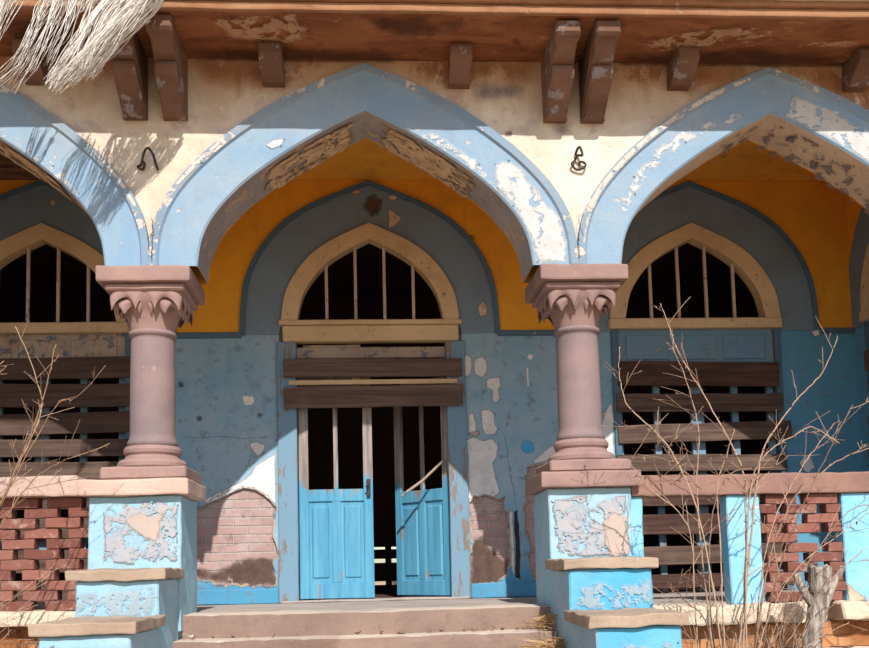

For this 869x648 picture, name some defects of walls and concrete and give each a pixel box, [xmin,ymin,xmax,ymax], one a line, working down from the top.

peeling [0,135,79,206]
peeling [266,122,353,191]
peeling [379,124,566,262]
peeling [583,78,751,242]
peeling [708,95,869,214]
spalling [465,354,556,584]
peeling [103,501,179,564]
spalling [197,442,278,588]
peeling [552,495,630,557]
peeling [76,588,155,617]
peeling [576,580,653,609]